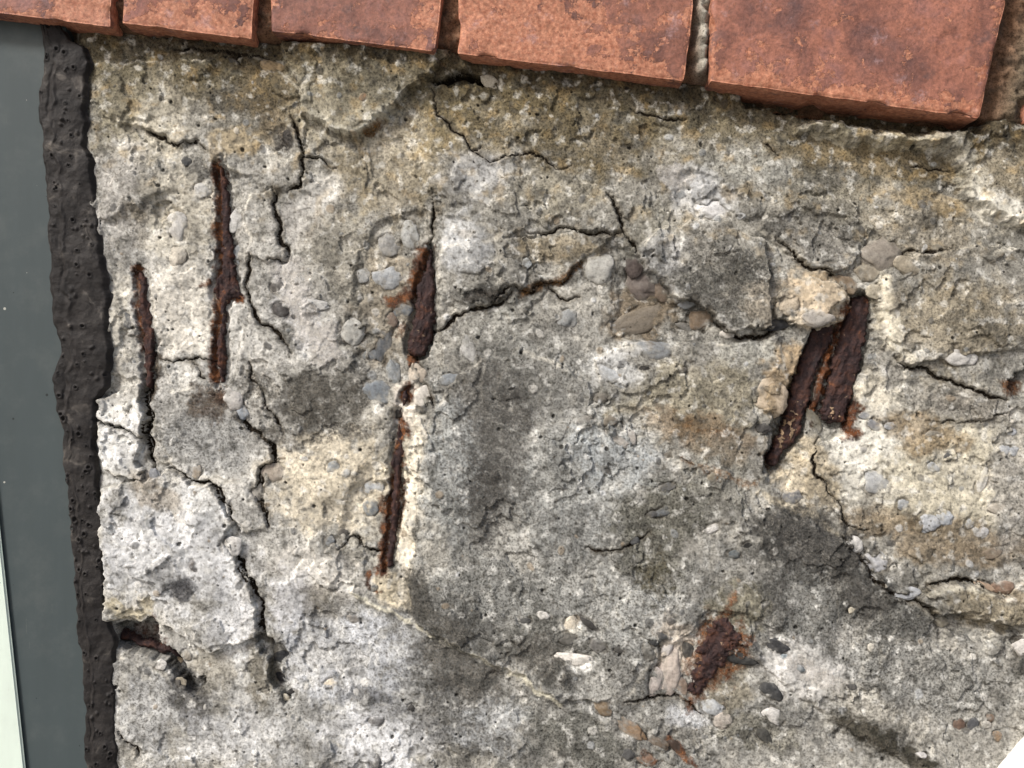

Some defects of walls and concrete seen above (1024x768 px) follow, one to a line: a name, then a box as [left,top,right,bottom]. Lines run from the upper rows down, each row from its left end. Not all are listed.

corrosion [131,264,157,389]
crack [104,388,237,525]
peeling [96,169,295,703]
corrosion [199,159,245,400]
crack [243,364,284,526]
crack [244,120,336,353]
spalling [325,210,445,614]
corrosion [364,381,415,593]
corrosion [385,242,436,367]
spalling [608,168,1024,645]
corrosion [764,296,869,470]
crack [236,555,267,633]